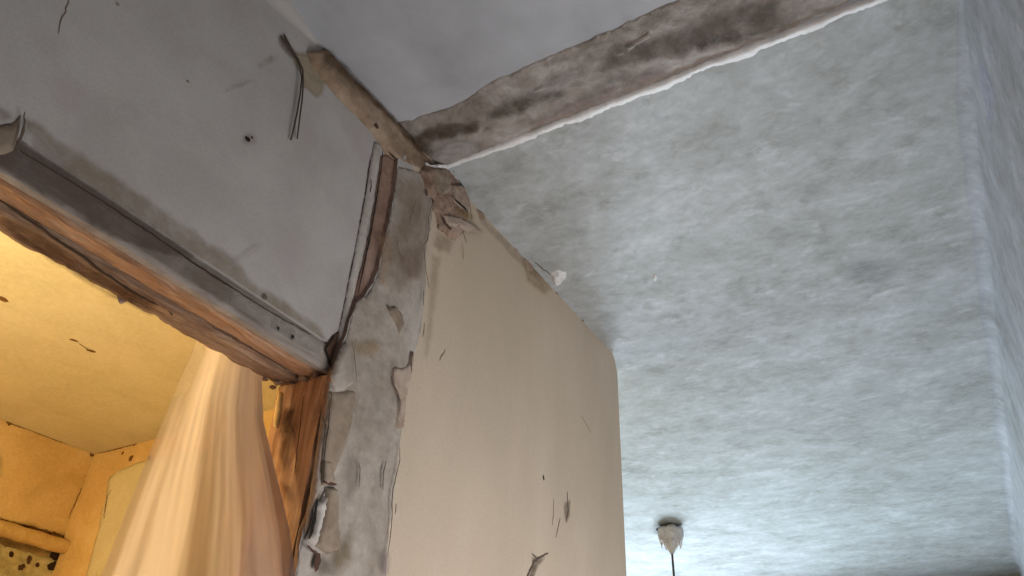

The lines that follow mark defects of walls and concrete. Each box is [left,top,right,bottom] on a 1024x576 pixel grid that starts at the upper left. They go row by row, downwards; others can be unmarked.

damp [611,6,775,66]
damp [414,124,478,161]
damp [492,83,561,118]
flaking render [294,0,850,259]
spalling [387,306,404,334]
peeling [323,331,354,392]
spalling [391,351,414,429]
flaking render [305,460,341,572]